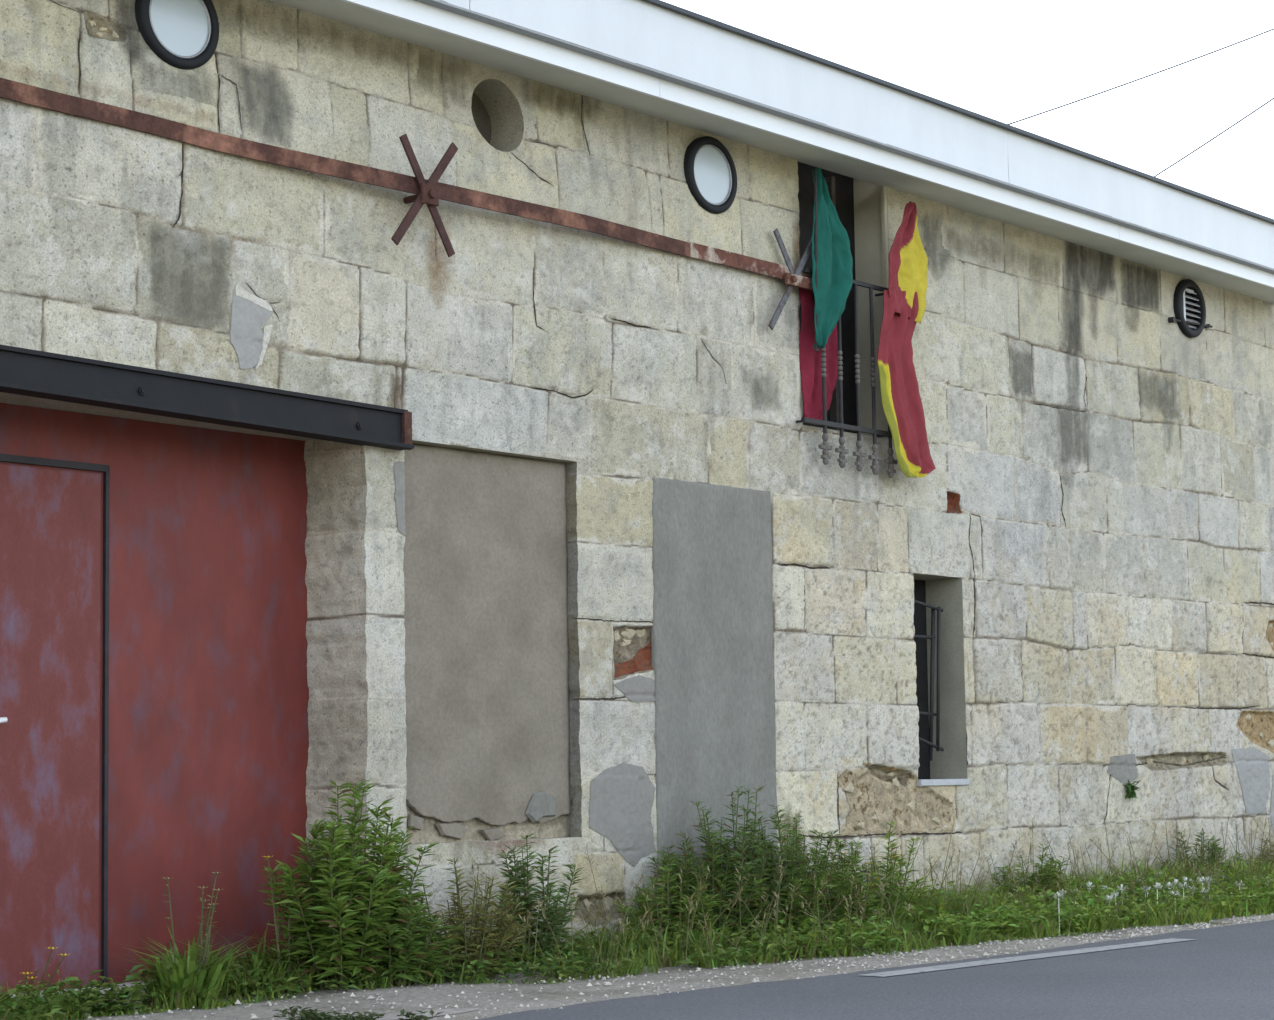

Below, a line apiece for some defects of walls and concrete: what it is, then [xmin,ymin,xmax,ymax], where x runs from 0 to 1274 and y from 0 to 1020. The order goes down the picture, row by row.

water stain [1066,242,1159,351]
spalling [613,625,654,680]
spalling [1266,620,1274,651]
spalling [1236,710,1274,753]
spalling [1136,752,1227,771]
spalling [838,763,953,838]